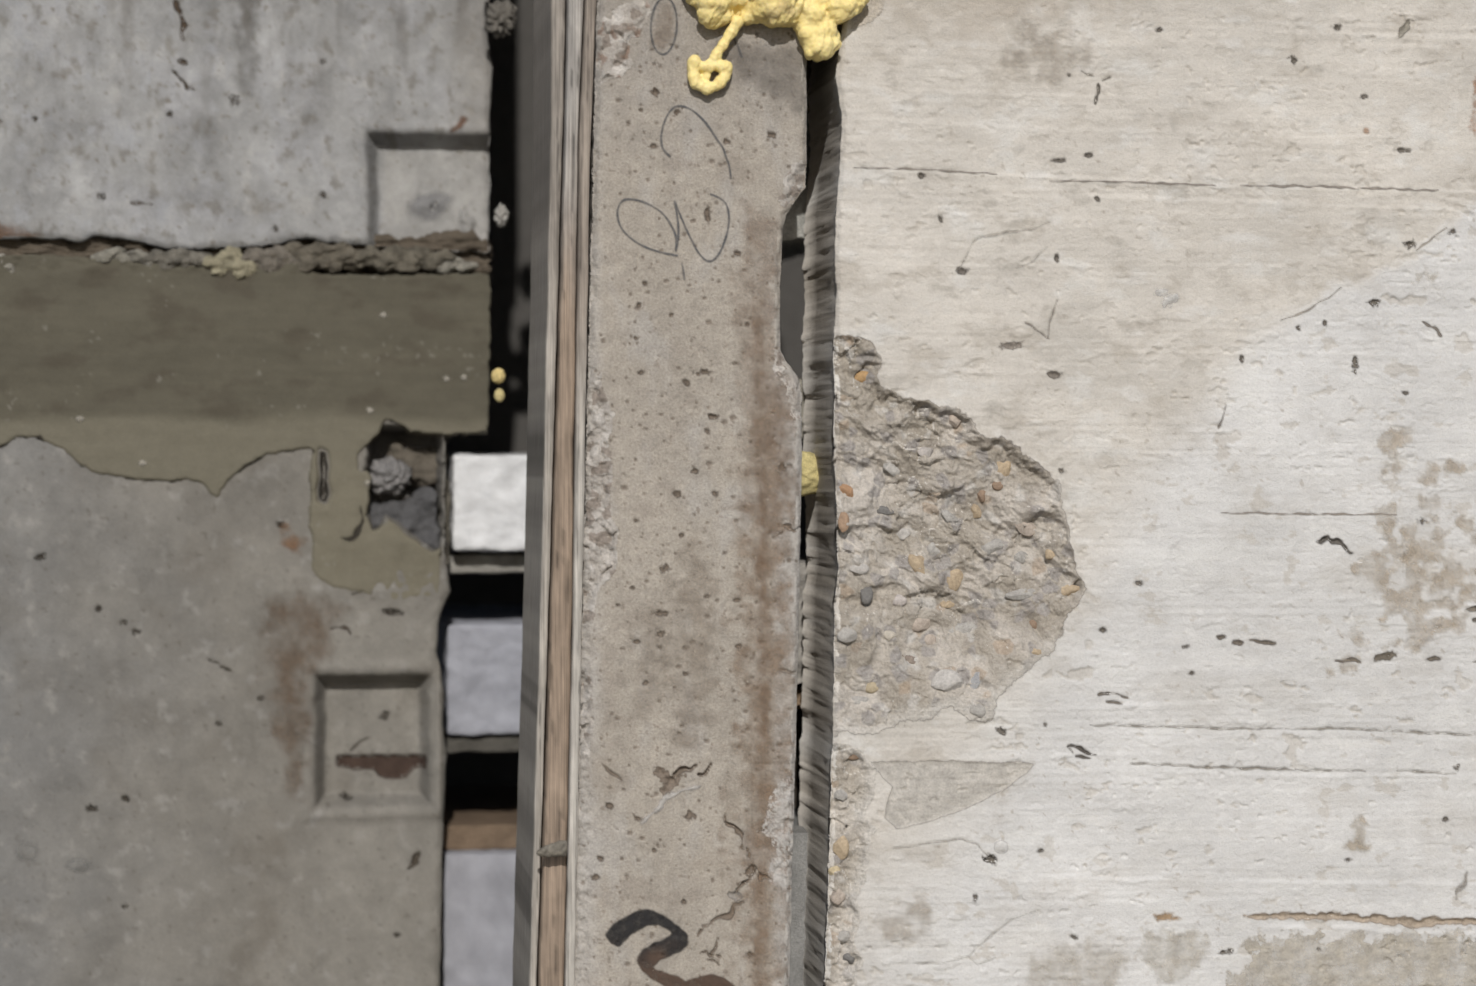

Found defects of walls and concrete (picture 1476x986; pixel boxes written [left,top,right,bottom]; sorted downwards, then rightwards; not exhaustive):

spalling [319,452,329,502]
spalling [369,437,451,566]
spalling [825,335,1086,986]